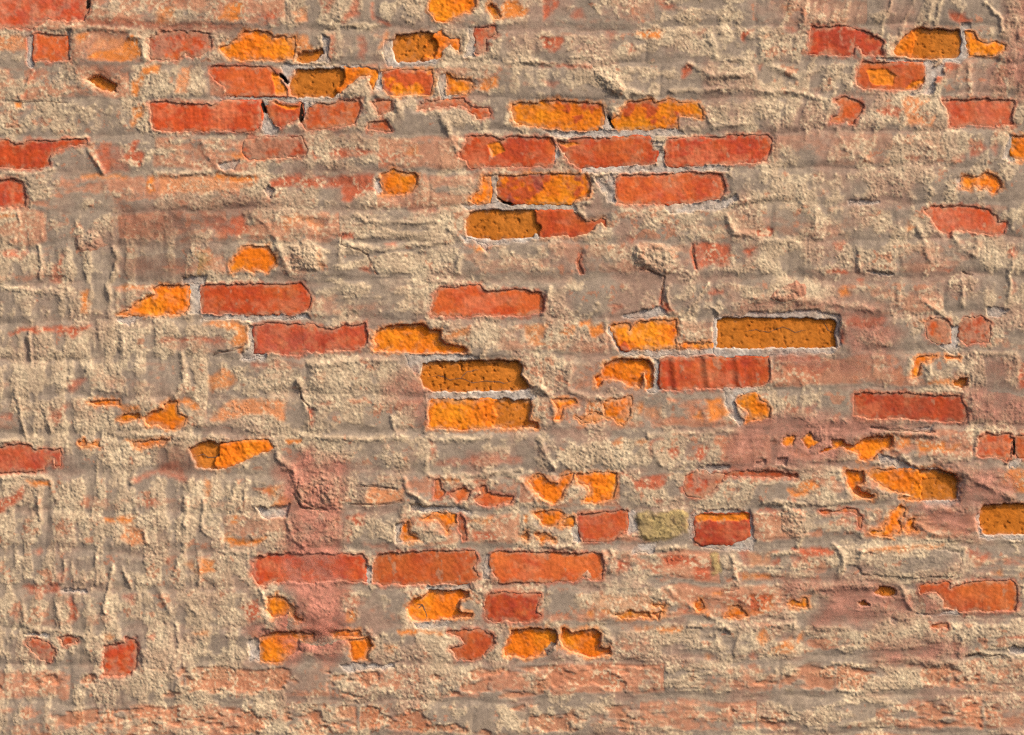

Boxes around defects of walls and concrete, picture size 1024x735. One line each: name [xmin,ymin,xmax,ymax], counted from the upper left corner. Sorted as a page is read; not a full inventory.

peeling [150,0,501,133]
peeling [808,25,1006,91]
peeling [0,139,87,208]
spalling [459,99,773,240]
peeling [118,245,544,430]
spalling [595,317,836,423]
peeling [853,378,967,422]
spalling [190,439,274,469]
peeling [252,472,629,663]
peeling [693,512,751,547]
spalling [782,432,958,537]
spalling [979,503,1024,535]